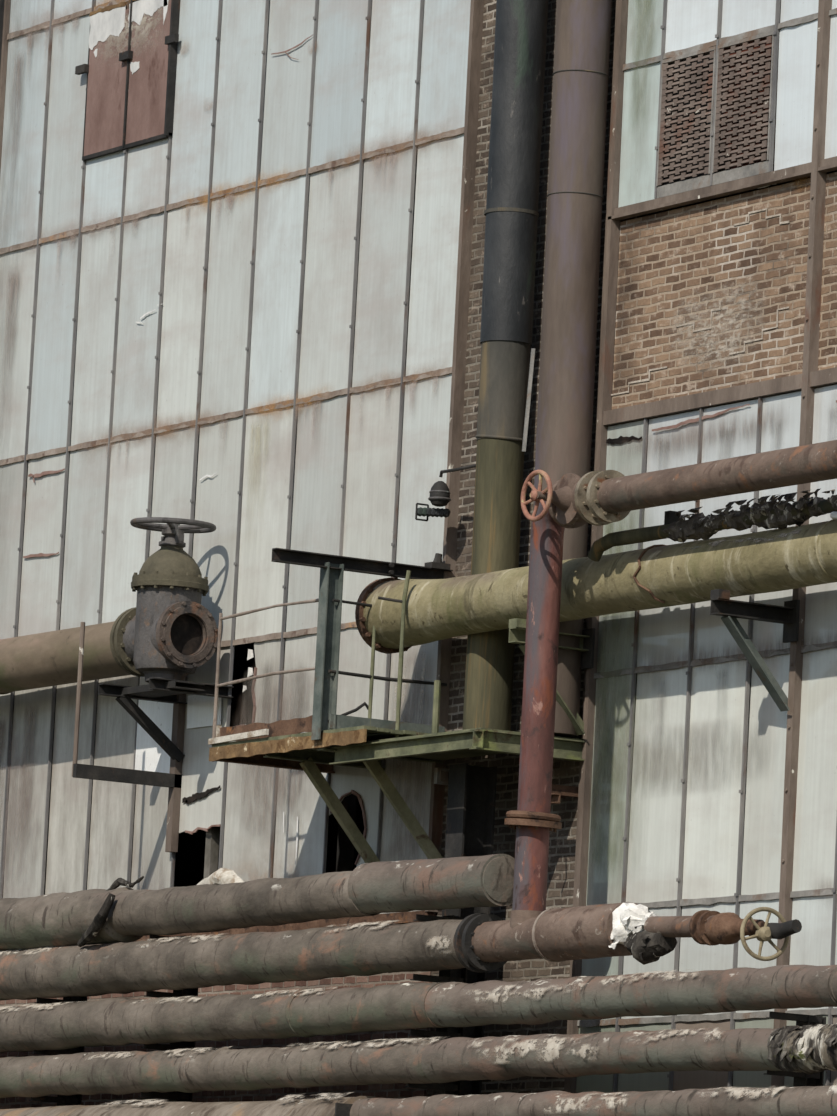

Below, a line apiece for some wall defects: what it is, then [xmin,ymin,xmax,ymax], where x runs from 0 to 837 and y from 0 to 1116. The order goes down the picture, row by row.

peeling [89,0,169,57]